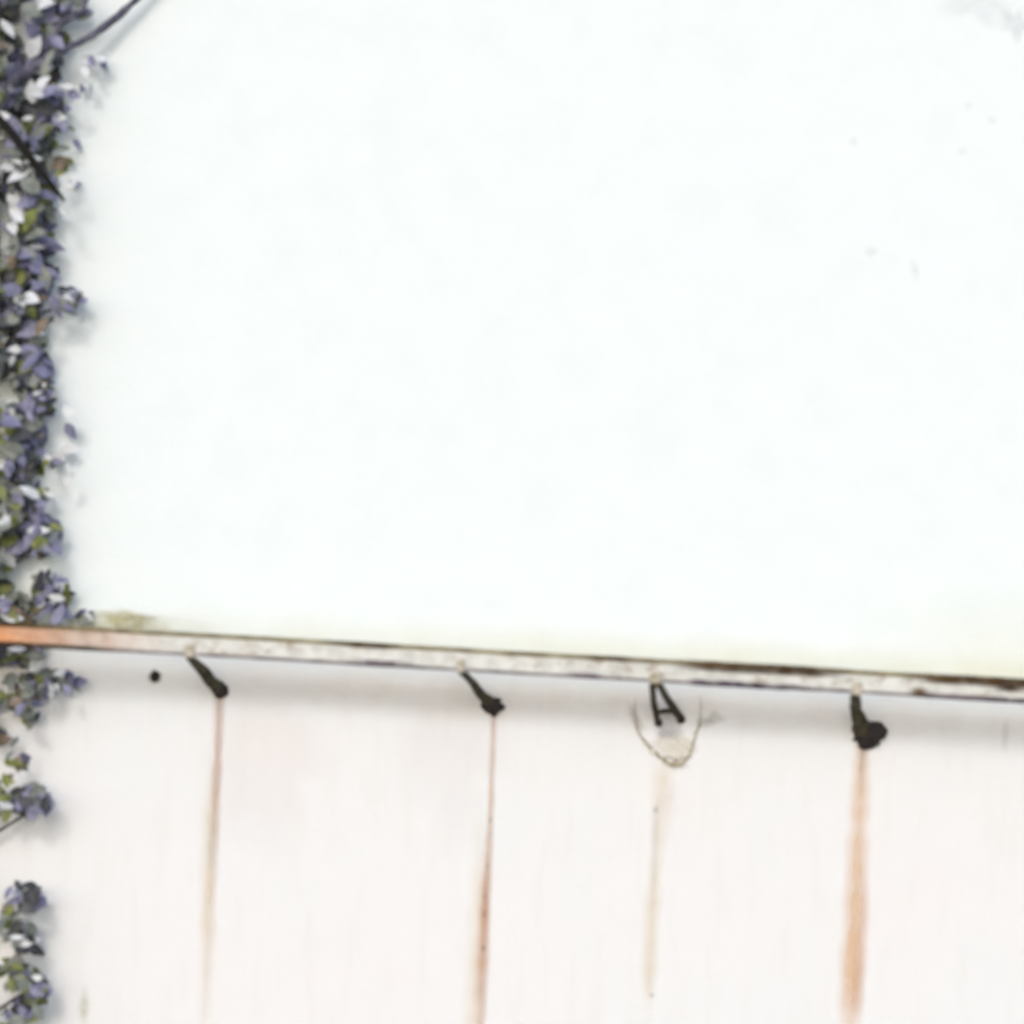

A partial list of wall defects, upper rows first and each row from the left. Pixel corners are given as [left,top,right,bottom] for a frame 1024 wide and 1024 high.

rust [0,622,97,651]